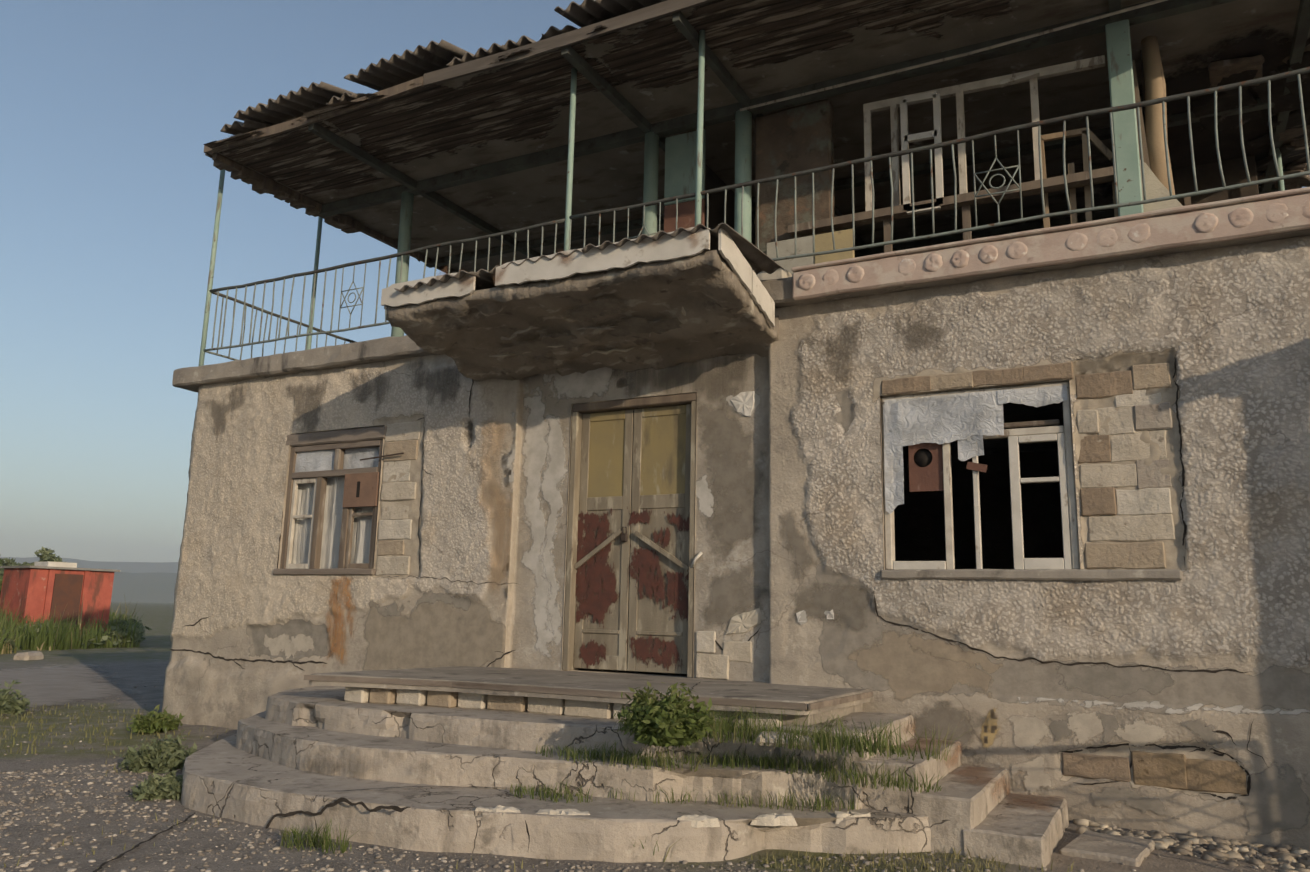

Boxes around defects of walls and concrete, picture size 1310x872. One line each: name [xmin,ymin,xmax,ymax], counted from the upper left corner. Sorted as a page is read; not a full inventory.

damp [212,392,237,433]
damp [290,386,320,432]
peeling [504,367,627,657]
crack [170,617,327,671]
corrosion [327,579,351,662]
peeling [796,563,1310,795]
crack [874,595,1252,673]
crack [266,786,501,833]